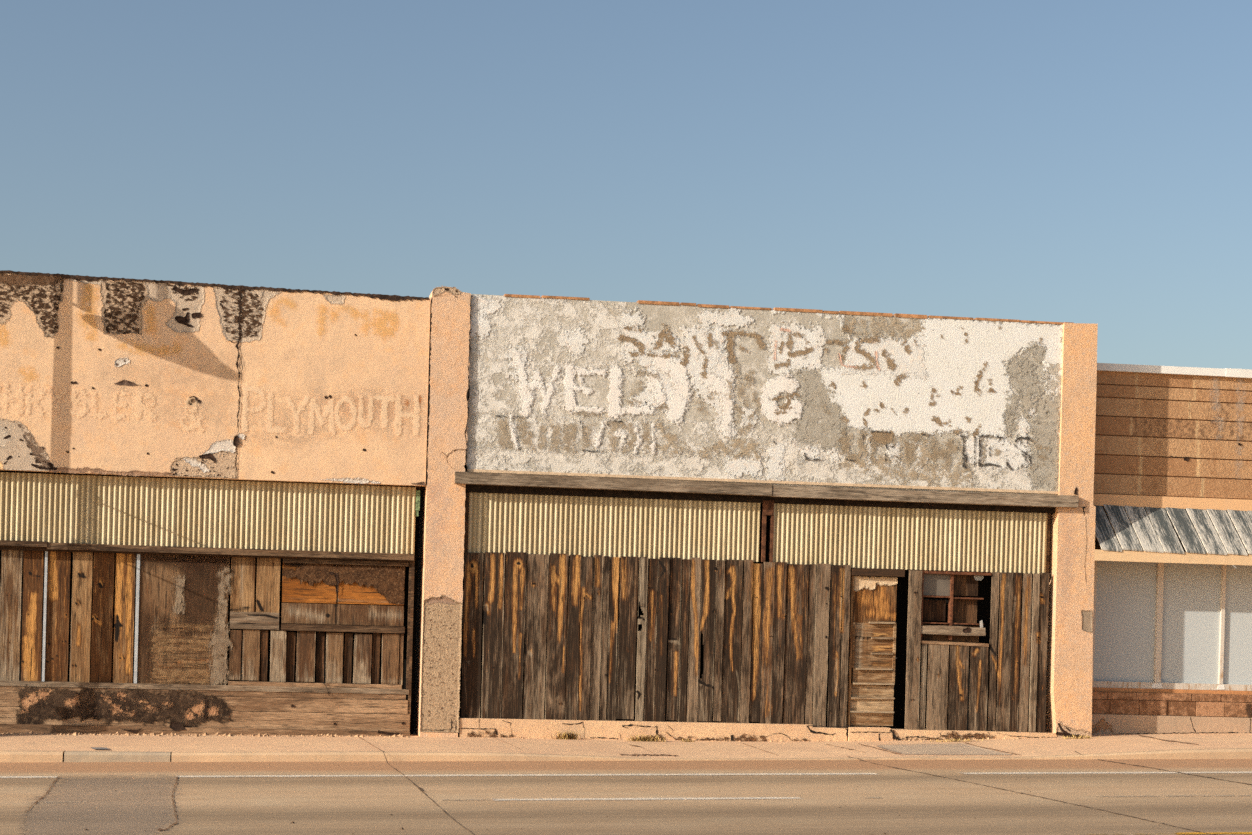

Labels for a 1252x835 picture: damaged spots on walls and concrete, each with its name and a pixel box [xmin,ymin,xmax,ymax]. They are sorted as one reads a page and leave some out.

peeling [0,418,245,478]
peeling [114,357,148,387]
spalling [0,273,281,349]
crack [229,286,243,476]
peeling [433,285,1063,491]
spalling [420,594,513,738]